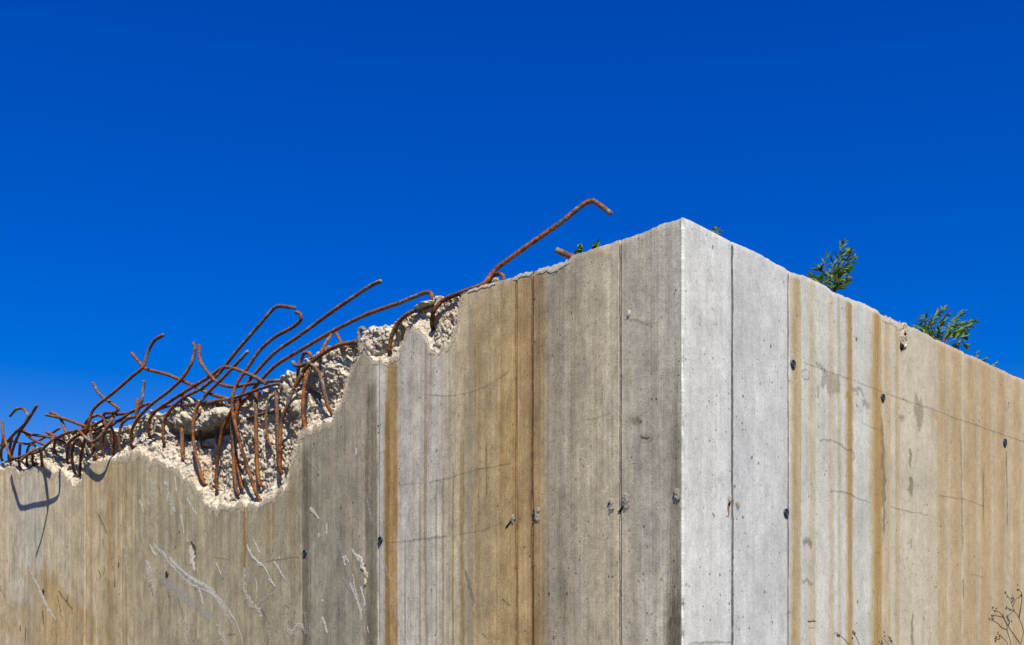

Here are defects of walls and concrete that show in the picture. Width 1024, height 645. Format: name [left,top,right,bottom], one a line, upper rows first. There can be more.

spalling [0,198,613,517]